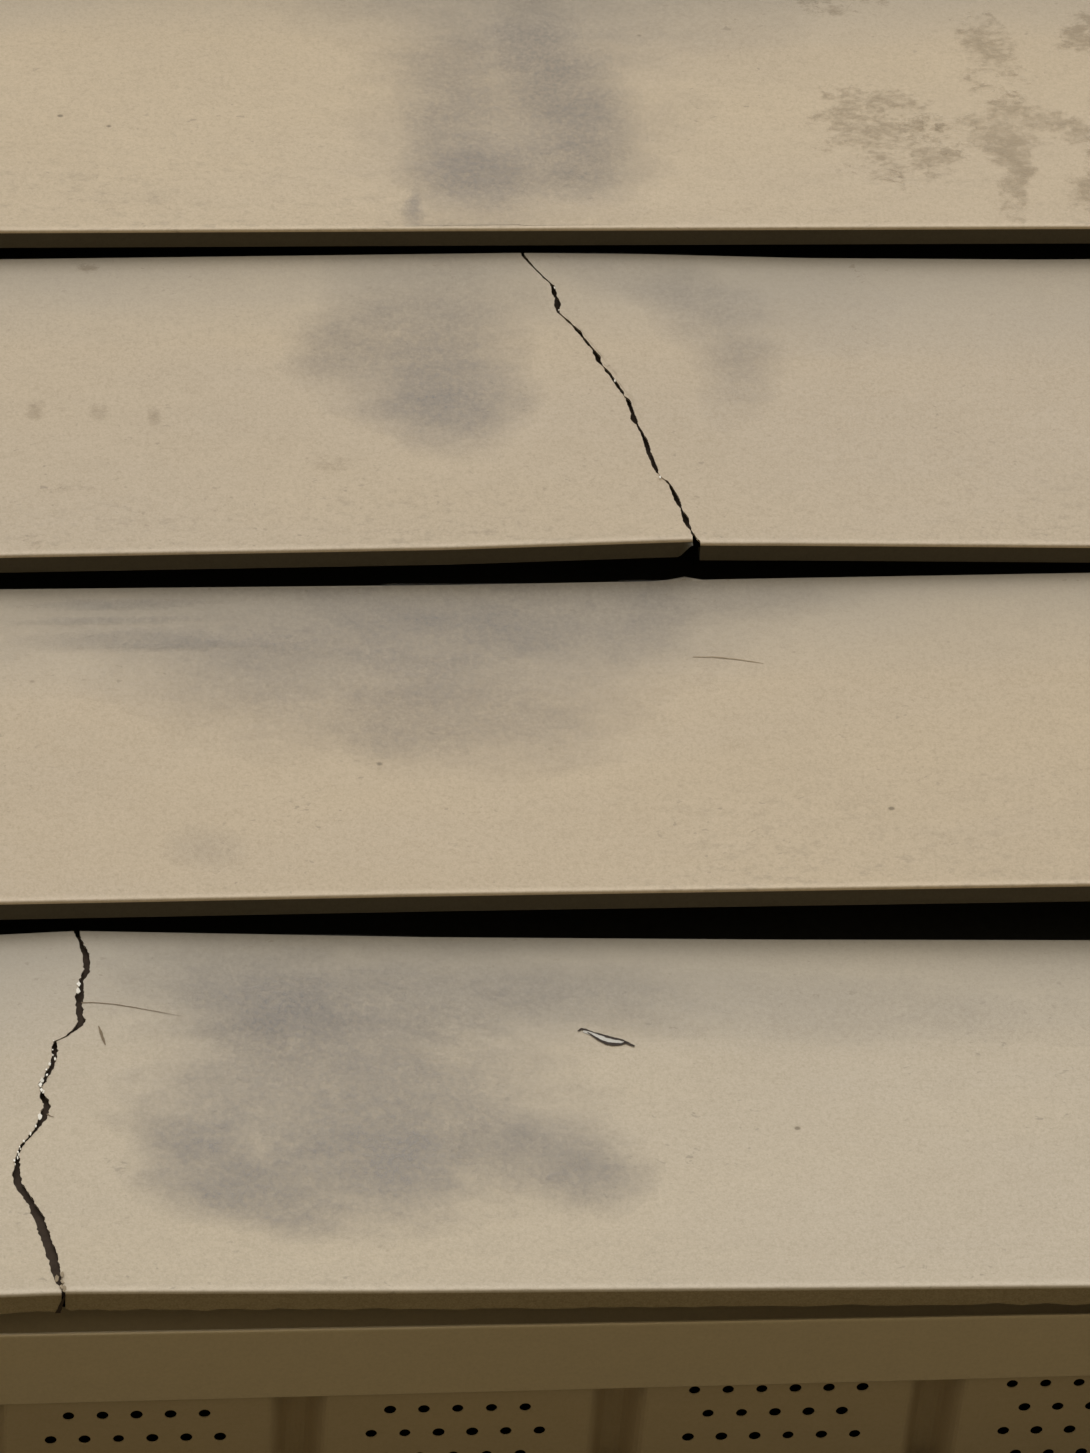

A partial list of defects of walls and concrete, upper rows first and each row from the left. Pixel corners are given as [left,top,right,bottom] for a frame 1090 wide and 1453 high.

crack [525,259,698,540]
crack [12,937,180,1313]